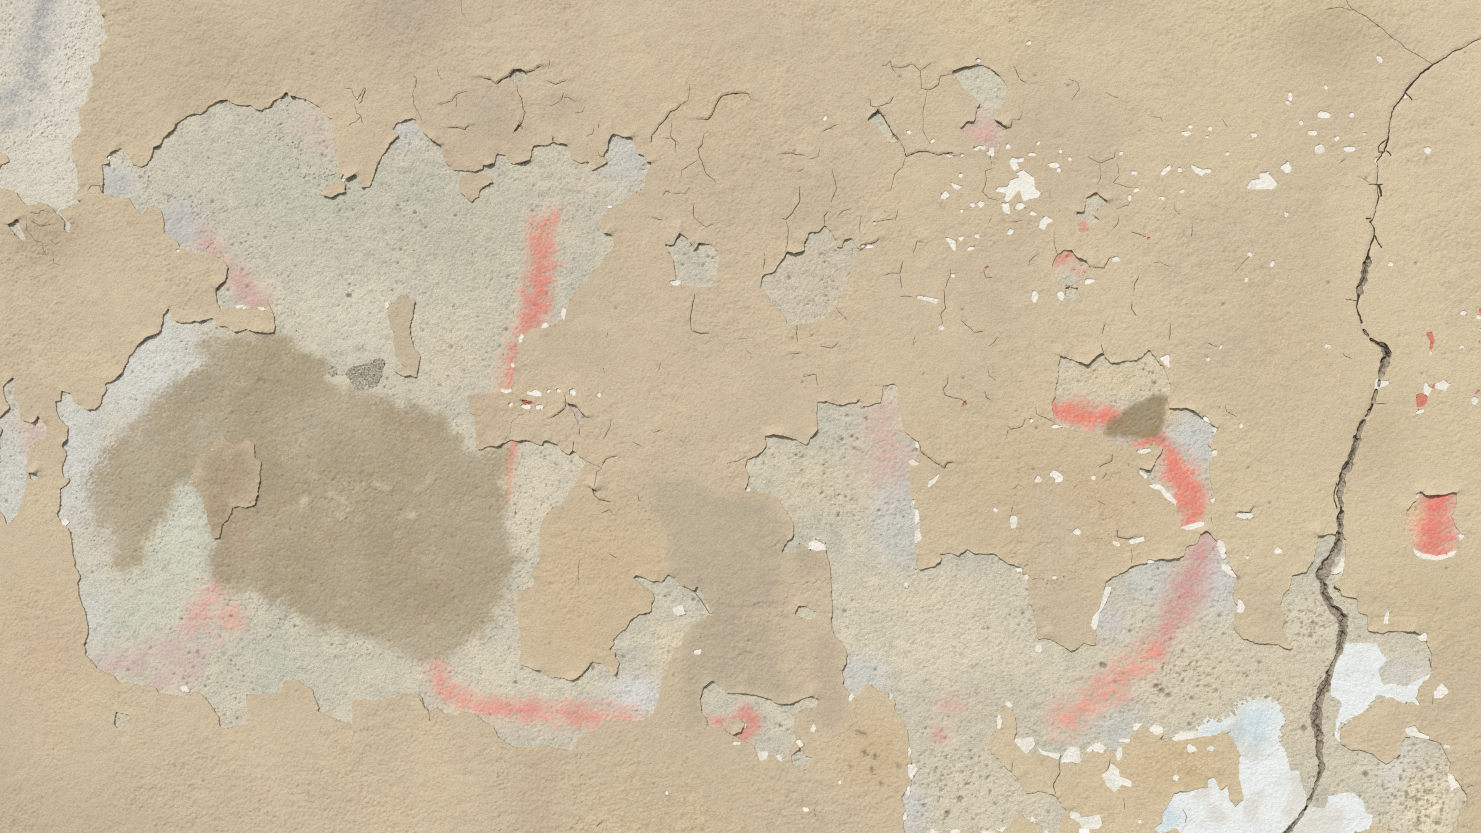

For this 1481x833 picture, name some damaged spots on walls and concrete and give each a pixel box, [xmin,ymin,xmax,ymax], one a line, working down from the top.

peeling [0,0,108,241]
peeling [666,233,719,287]
peeling [761,226,873,325]
peeling [931,139,1072,235]
peeling [1246,161,1292,189]
peeling [0,378,38,524]
peeling [56,92,652,658]
peeling [1055,350,1218,503]
crack [1283,2,1481,833]
peeling [1415,379,1451,414]
peeling [173,595,455,728]
peeling [455,401,1467,833]